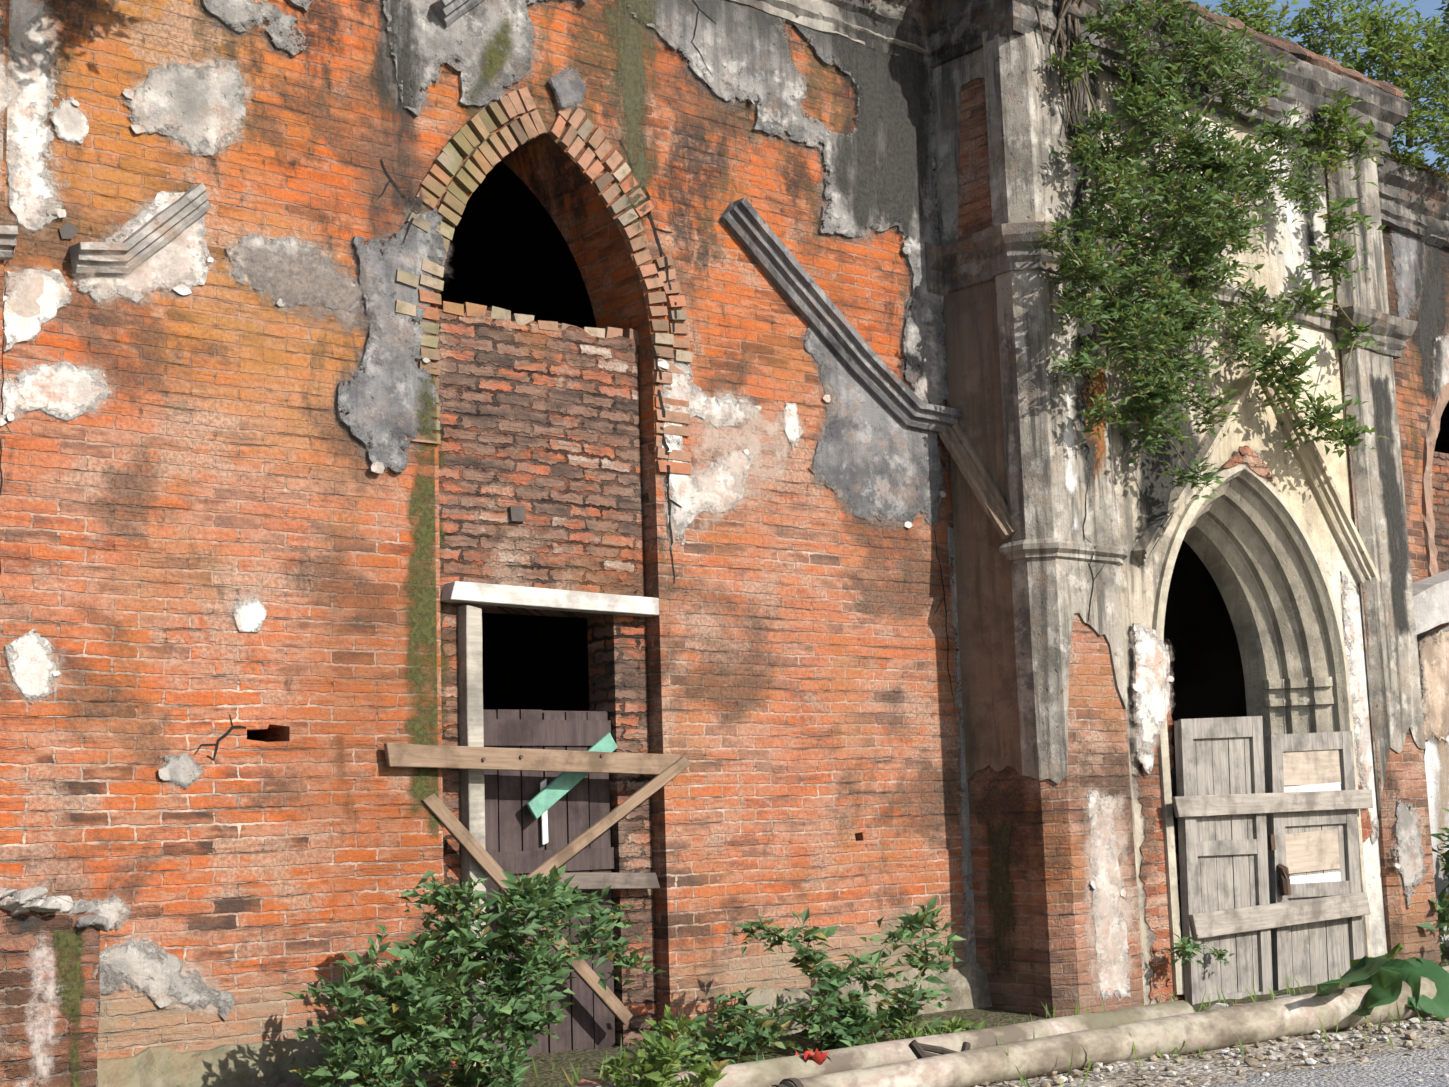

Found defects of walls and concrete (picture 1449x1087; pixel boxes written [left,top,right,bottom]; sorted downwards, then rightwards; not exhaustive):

crack [0,246,15,495]
flaking render [0,0,89,239]
flaking render [0,362,113,426]
flaking render [2,213,358,352]
water stain [375,0,424,213]
water stain [430,0,483,28]
water stain [604,0,659,232]
flaking render [627,0,949,406]
water stain [719,198,1410,635]
water stain [1354,146,1368,282]
spalling [1086,623,1185,1004]
flaking render [1340,571,1426,909]